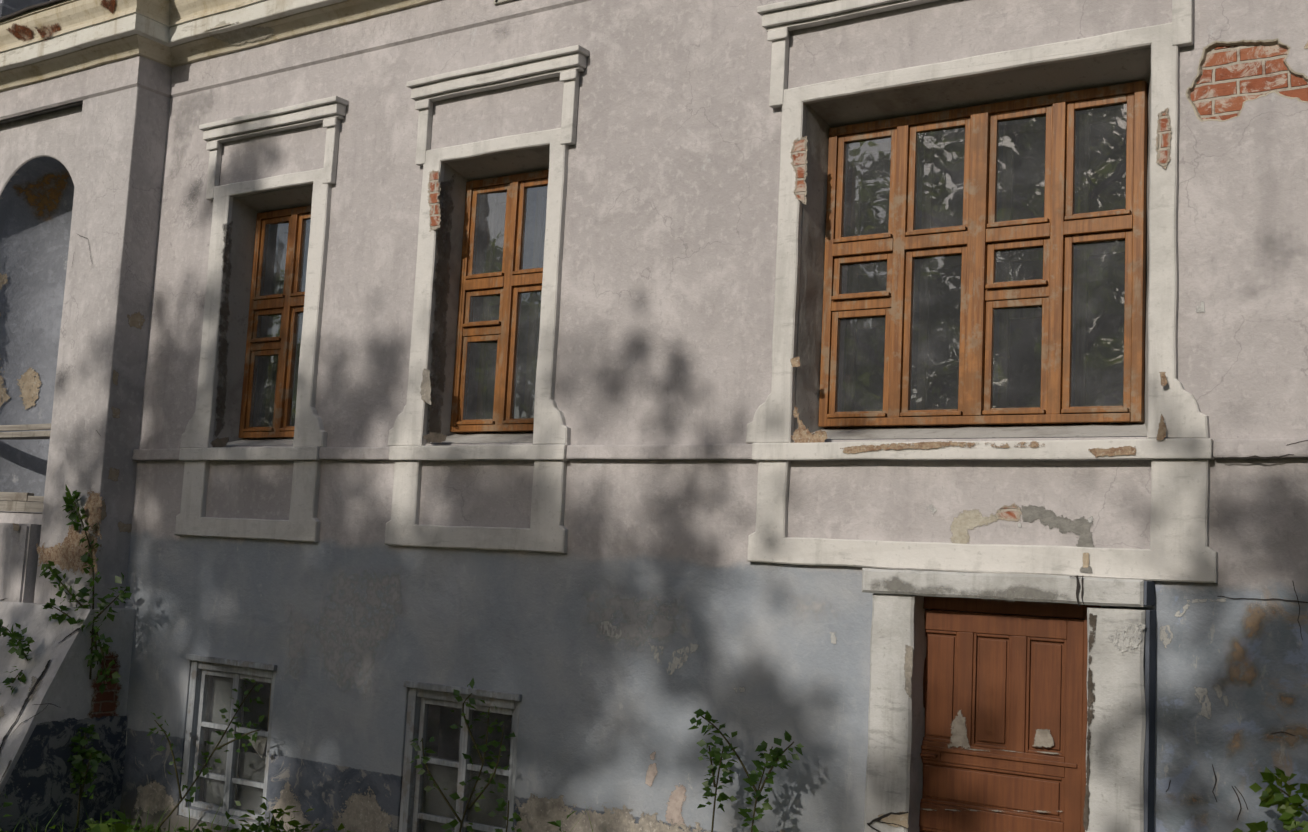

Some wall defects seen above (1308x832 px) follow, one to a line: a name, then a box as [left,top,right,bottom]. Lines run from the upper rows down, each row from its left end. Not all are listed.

flaking render [1186,38,1308,122]
flaking render [790,136,808,204]
flaking render [427,170,441,231]
spalling [420,369,431,405]
spalling [791,406,827,443]
spalling [842,441,1045,454]
spalling [1089,446,1136,457]
spalling [36,468,132,575]
spalling [950,503,1094,573]
crack [1217,582,1308,640]
spalling [272,781,312,832]
spalling [514,784,707,832]